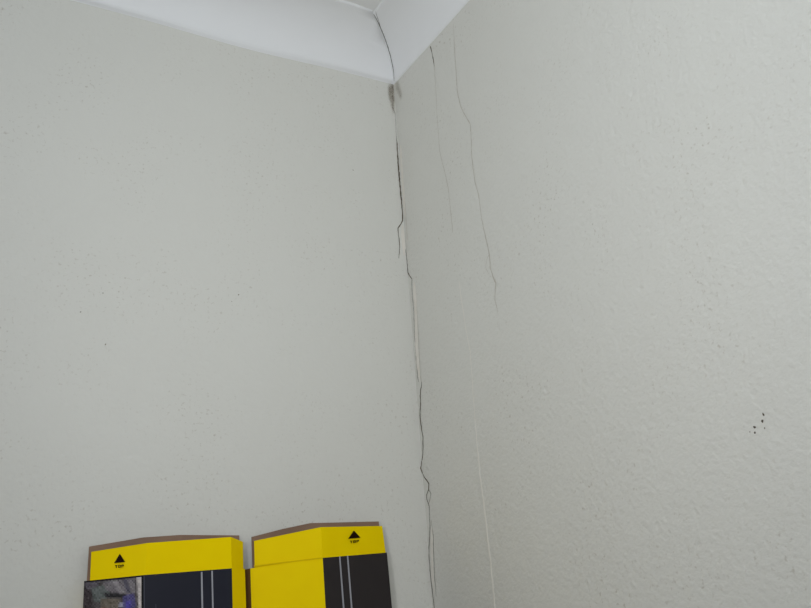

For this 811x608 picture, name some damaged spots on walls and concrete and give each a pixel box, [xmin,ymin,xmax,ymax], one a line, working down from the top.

crack [393,109,436,603]
crack [454,47,498,312]